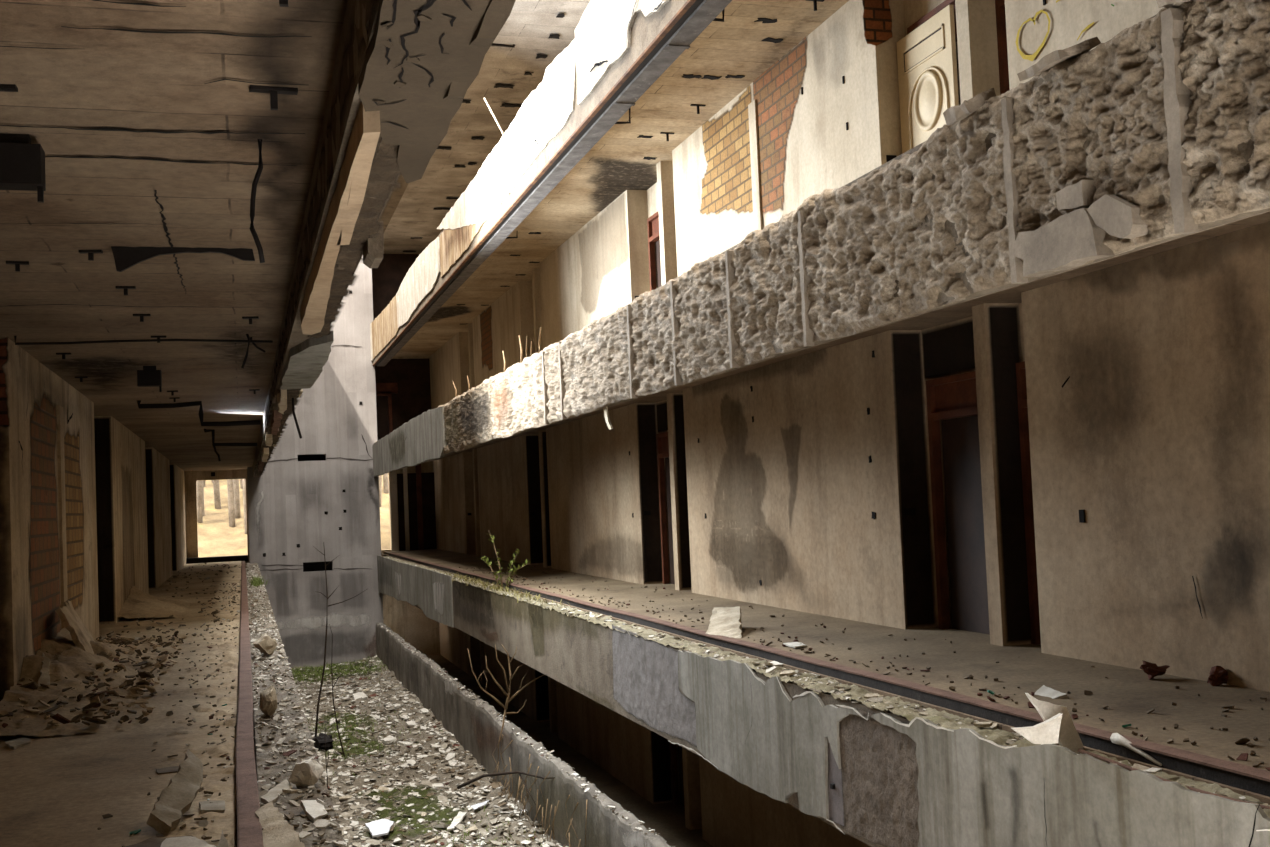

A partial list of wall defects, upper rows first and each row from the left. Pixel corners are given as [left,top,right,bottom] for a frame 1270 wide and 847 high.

crack [372,0,472,129]
flaking render [700,37,806,214]
flaking render [862,0,892,46]
crack [0,125,305,294]
spalling [254,0,379,476]
spalling [308,136,401,338]
flaking render [0,337,10,427]
spalling [376,622,671,847]
spalling [589,614,716,767]
peeling [745,662,822,706]
spalling [826,693,954,847]
crack [1248,804,1260,847]